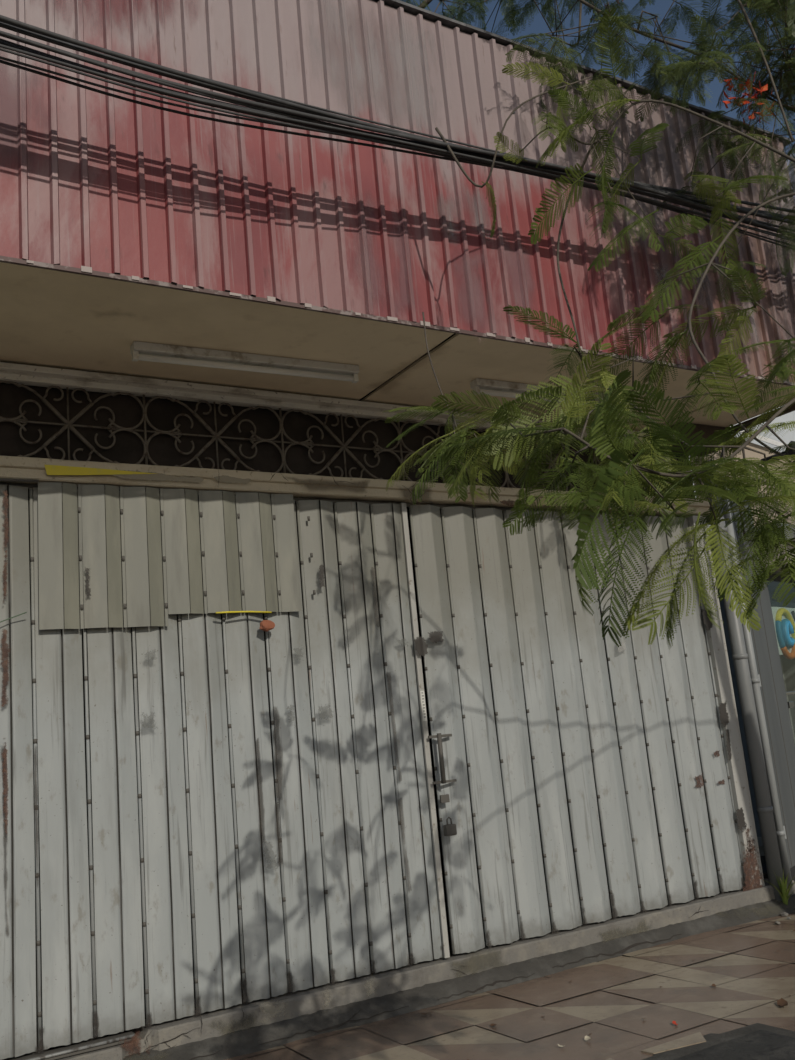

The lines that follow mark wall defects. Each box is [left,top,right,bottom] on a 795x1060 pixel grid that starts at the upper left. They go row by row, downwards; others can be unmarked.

corrosion [1,629,10,707]
corrosion [736,808,763,892]
crack [259,1006,407,1045]